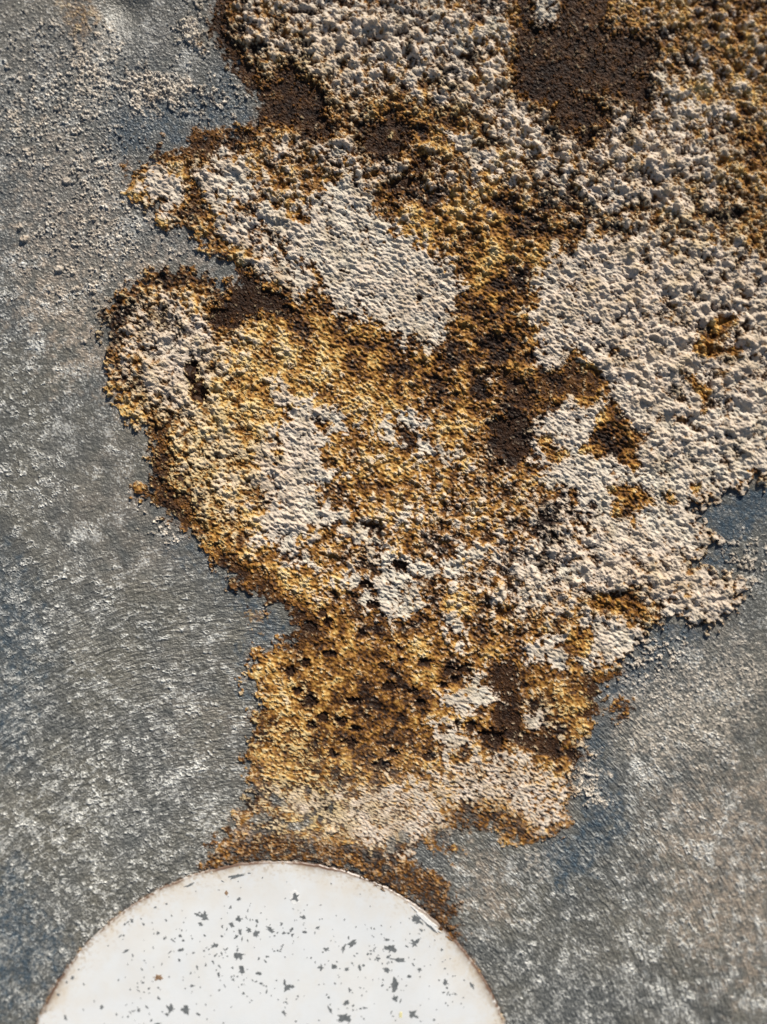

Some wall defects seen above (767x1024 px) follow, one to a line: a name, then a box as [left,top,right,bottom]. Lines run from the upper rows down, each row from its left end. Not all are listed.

damp [149,528,293,721]
corrosion [90,0,767,873]
damp [696,479,767,583]
corrosion [319,832,469,944]